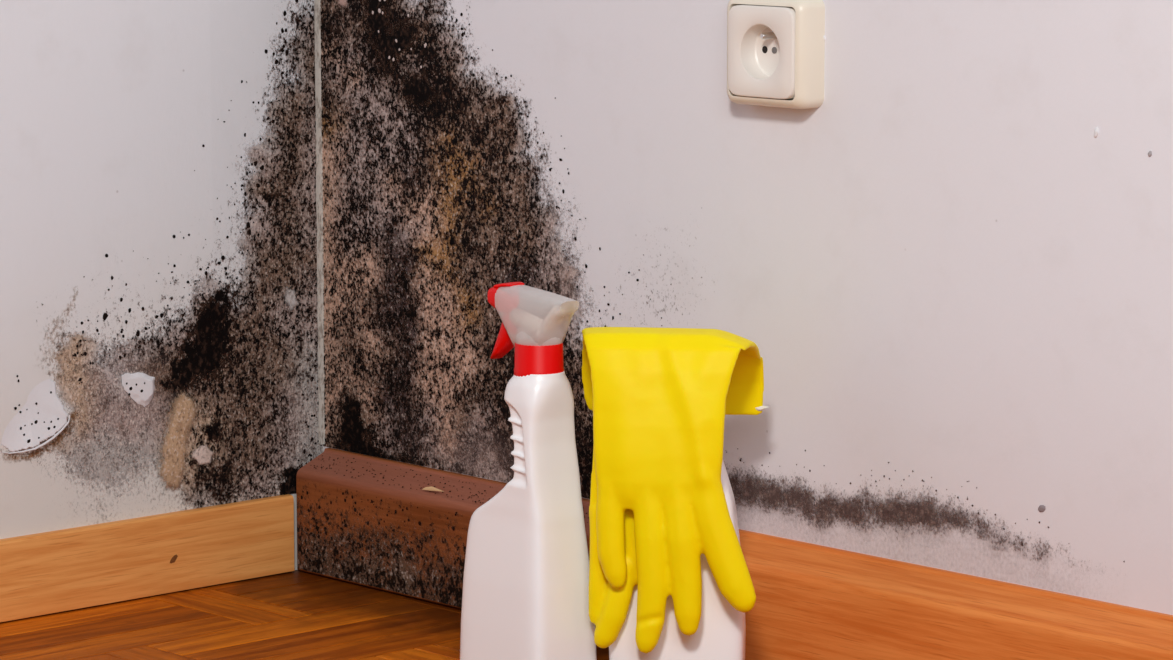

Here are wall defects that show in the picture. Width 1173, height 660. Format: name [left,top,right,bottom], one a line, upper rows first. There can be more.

damp [4,0,621,607]
peeling [0,379,70,454]
peeling [121,372,155,407]
damp [725,448,1049,550]